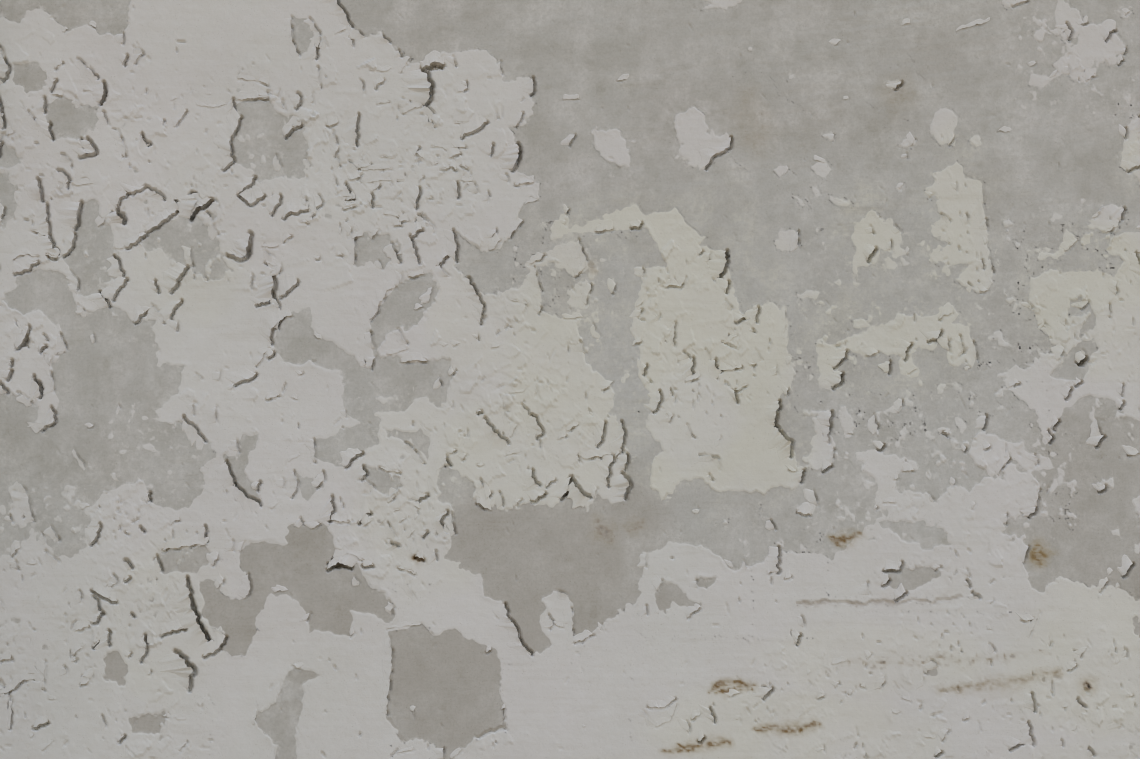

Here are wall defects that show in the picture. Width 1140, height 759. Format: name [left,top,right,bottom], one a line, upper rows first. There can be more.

peeling [1115,103,1140,185]
peeling [0,0,853,515]
peeling [0,193,1140,759]
crack [186,577,214,643]
corrosion [706,673,763,700]
corrosion [657,730,738,759]
corrosion [751,716,829,741]